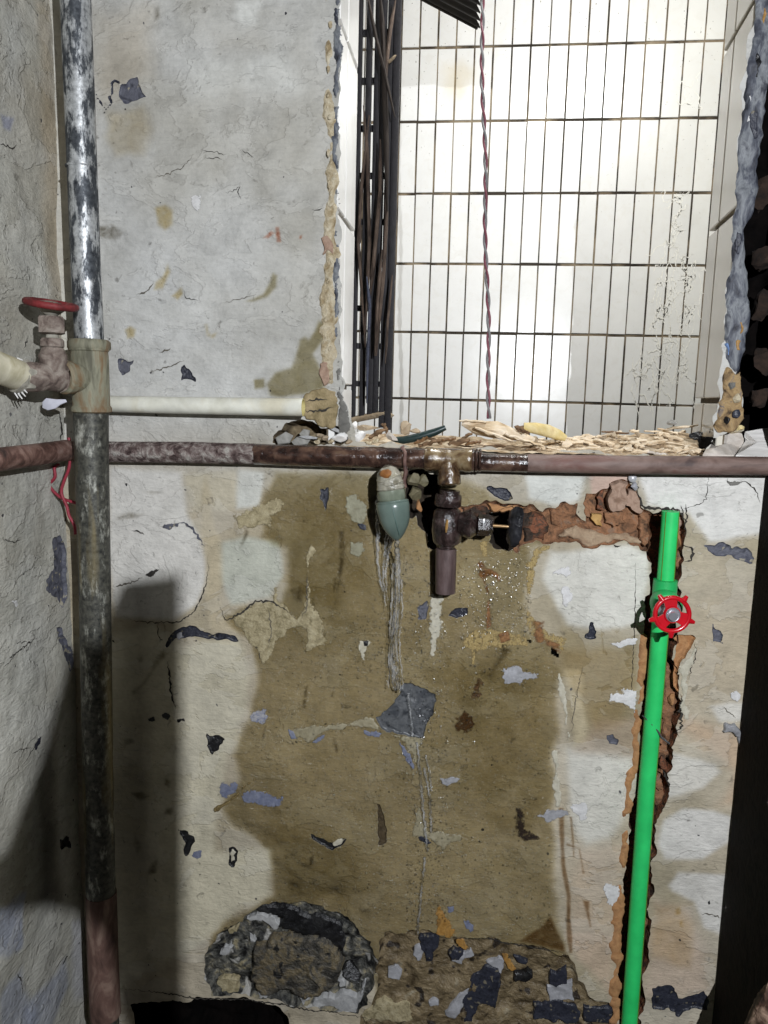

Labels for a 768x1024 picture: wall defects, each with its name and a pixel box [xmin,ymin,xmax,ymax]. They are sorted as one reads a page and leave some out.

spalling [273,0,351,446]
peeling [698,0,768,453]
flaking render [458,479,652,553]
crack [129,522,209,723]
flaking render [288,683,437,778]
corrosion [478,541,500,628]
water stain [463,545,567,665]
flaking render [609,634,649,817]
flaking render [673,634,698,720]
water stain [515,808,539,841]
spalling [131,884,625,1024]
flaking render [651,985,709,1017]